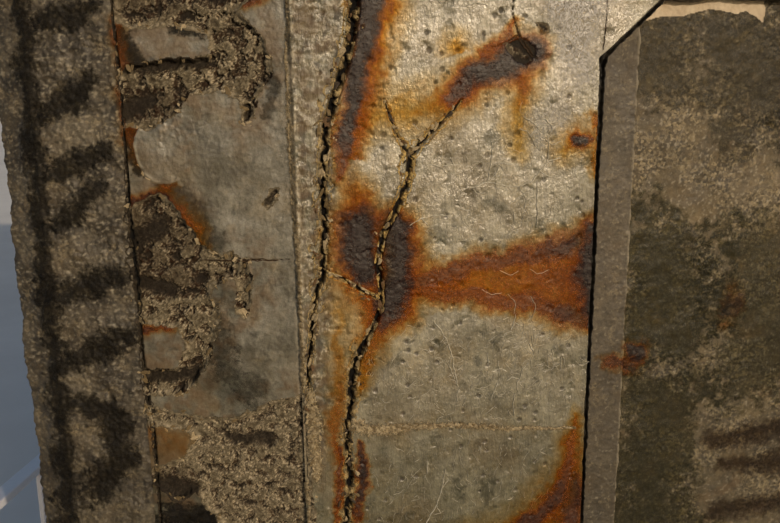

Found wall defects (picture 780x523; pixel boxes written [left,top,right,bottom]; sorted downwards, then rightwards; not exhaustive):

spalling [113,0,273,131]
rust [334,0,383,180]
rust [443,20,545,106]
rust [572,135,588,146]
water stain [638,9,780,163]
crack [201,256,289,264]
rust [340,194,594,357]
spalling [124,187,318,523]
water stain [614,184,780,523]
rust [334,446,344,523]
rust [351,441,369,523]
rust [517,430,582,523]